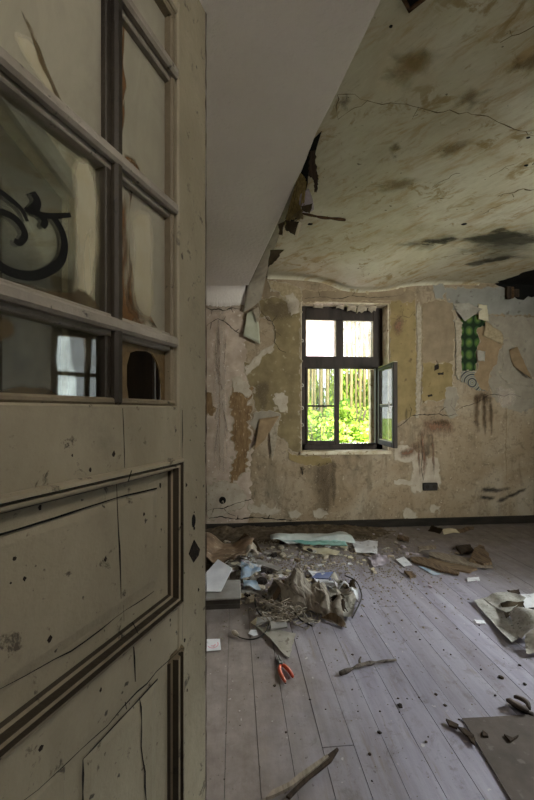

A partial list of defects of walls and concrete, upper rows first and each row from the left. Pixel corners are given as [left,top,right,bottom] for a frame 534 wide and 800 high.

crack [336,94,533,136]
damp [414,228,534,266]
flaking render [445,283,534,318]
flaking render [196,289,333,524]
damp [475,393,492,433]
spalling [380,439,442,494]
crack [208,499,300,521]